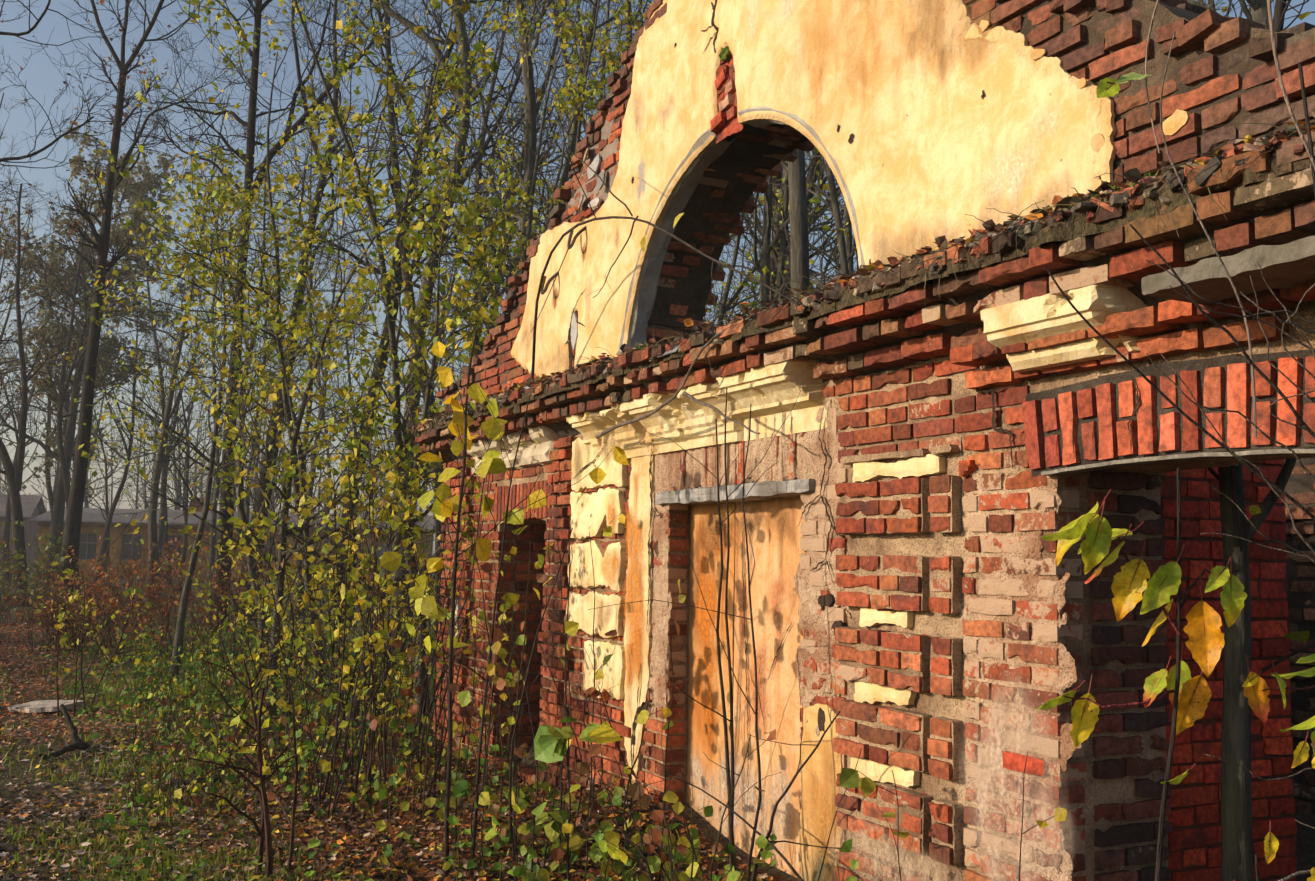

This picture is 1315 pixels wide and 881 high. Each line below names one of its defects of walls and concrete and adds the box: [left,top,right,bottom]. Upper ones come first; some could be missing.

peeling [958,4,1116,190]
spalling [568,112,620,215]
spalling [958,460,978,477]
spalling [817,594,848,636]
spalling [815,707,825,737]
spalling [1002,751,1048,775]